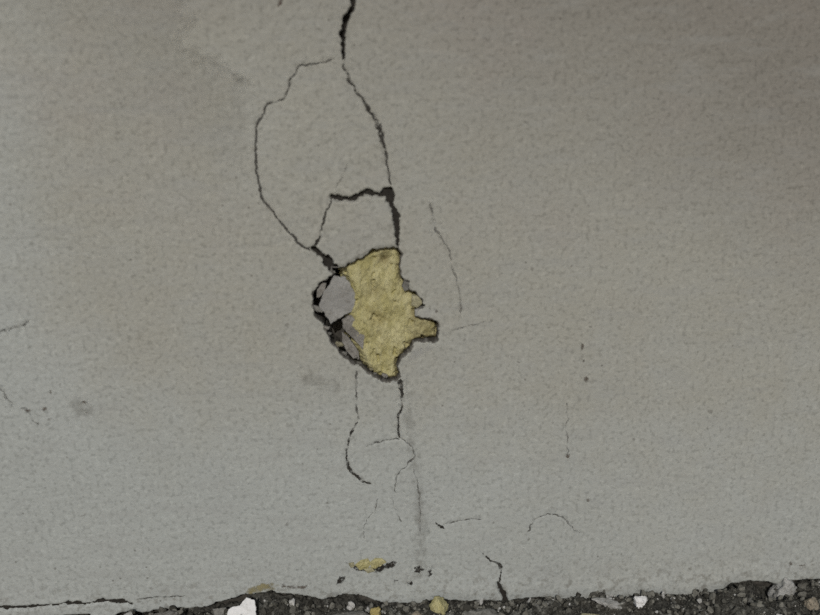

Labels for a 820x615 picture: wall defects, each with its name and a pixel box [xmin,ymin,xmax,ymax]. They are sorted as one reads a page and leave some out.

crack [254,0,401,270]
spalling [311,246,440,383]
crack [346,372,371,484]
crack [375,379,414,492]
crack [482,553,507,601]